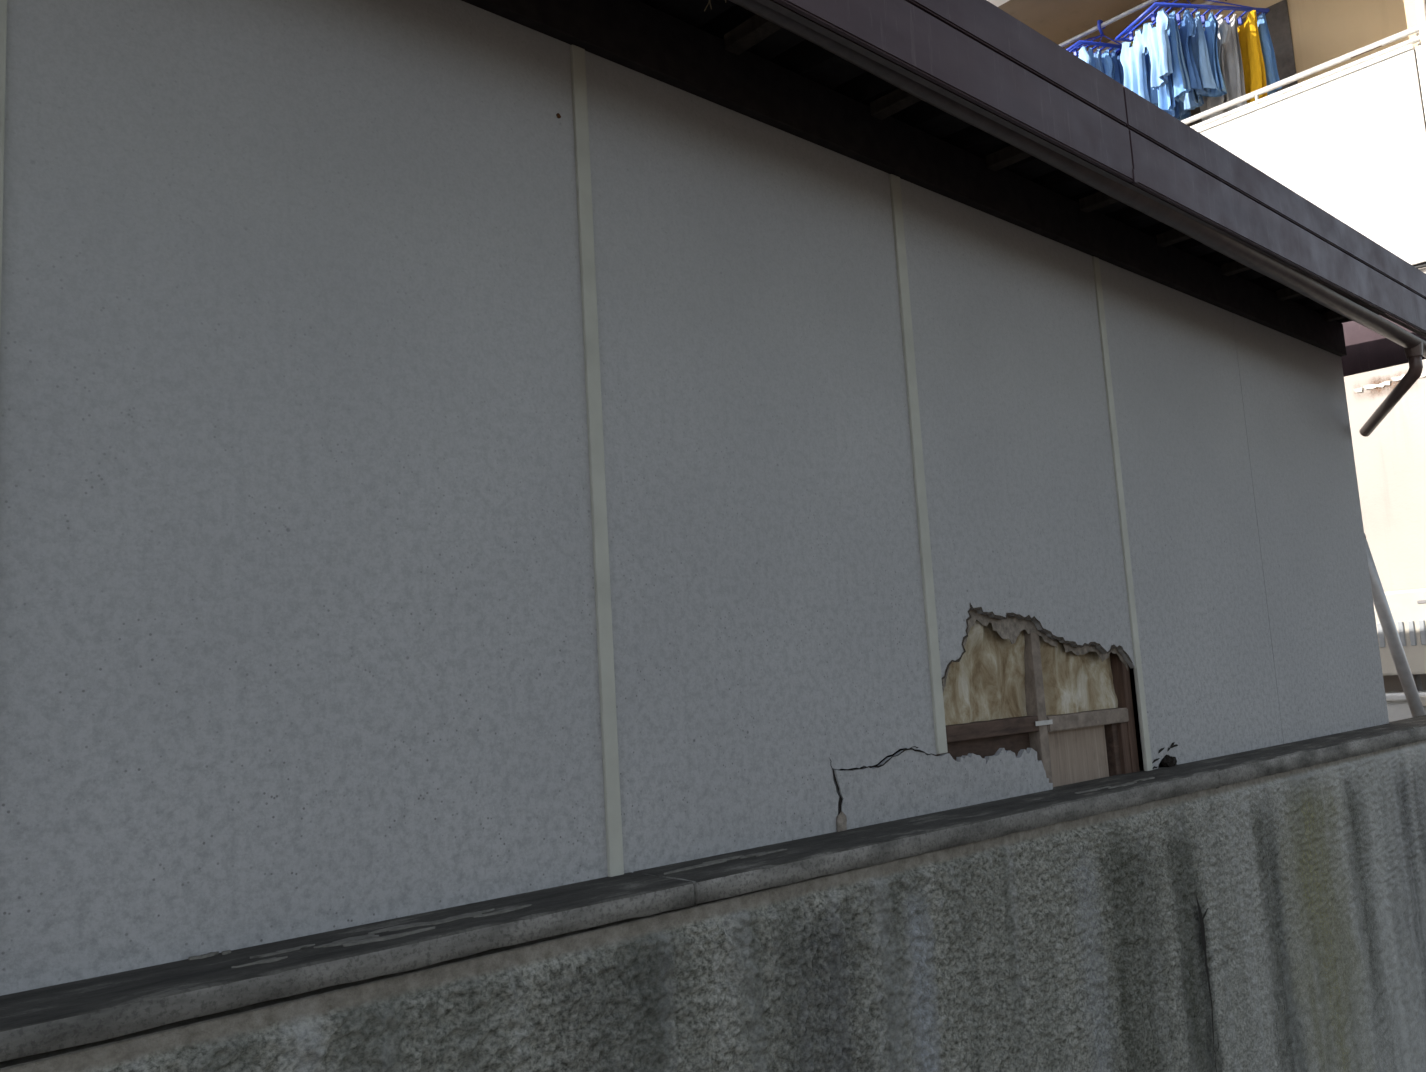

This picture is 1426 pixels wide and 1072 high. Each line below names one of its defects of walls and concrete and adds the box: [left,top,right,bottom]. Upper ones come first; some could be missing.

crack [829,746,941,832]
spalling [934,603,1178,794]